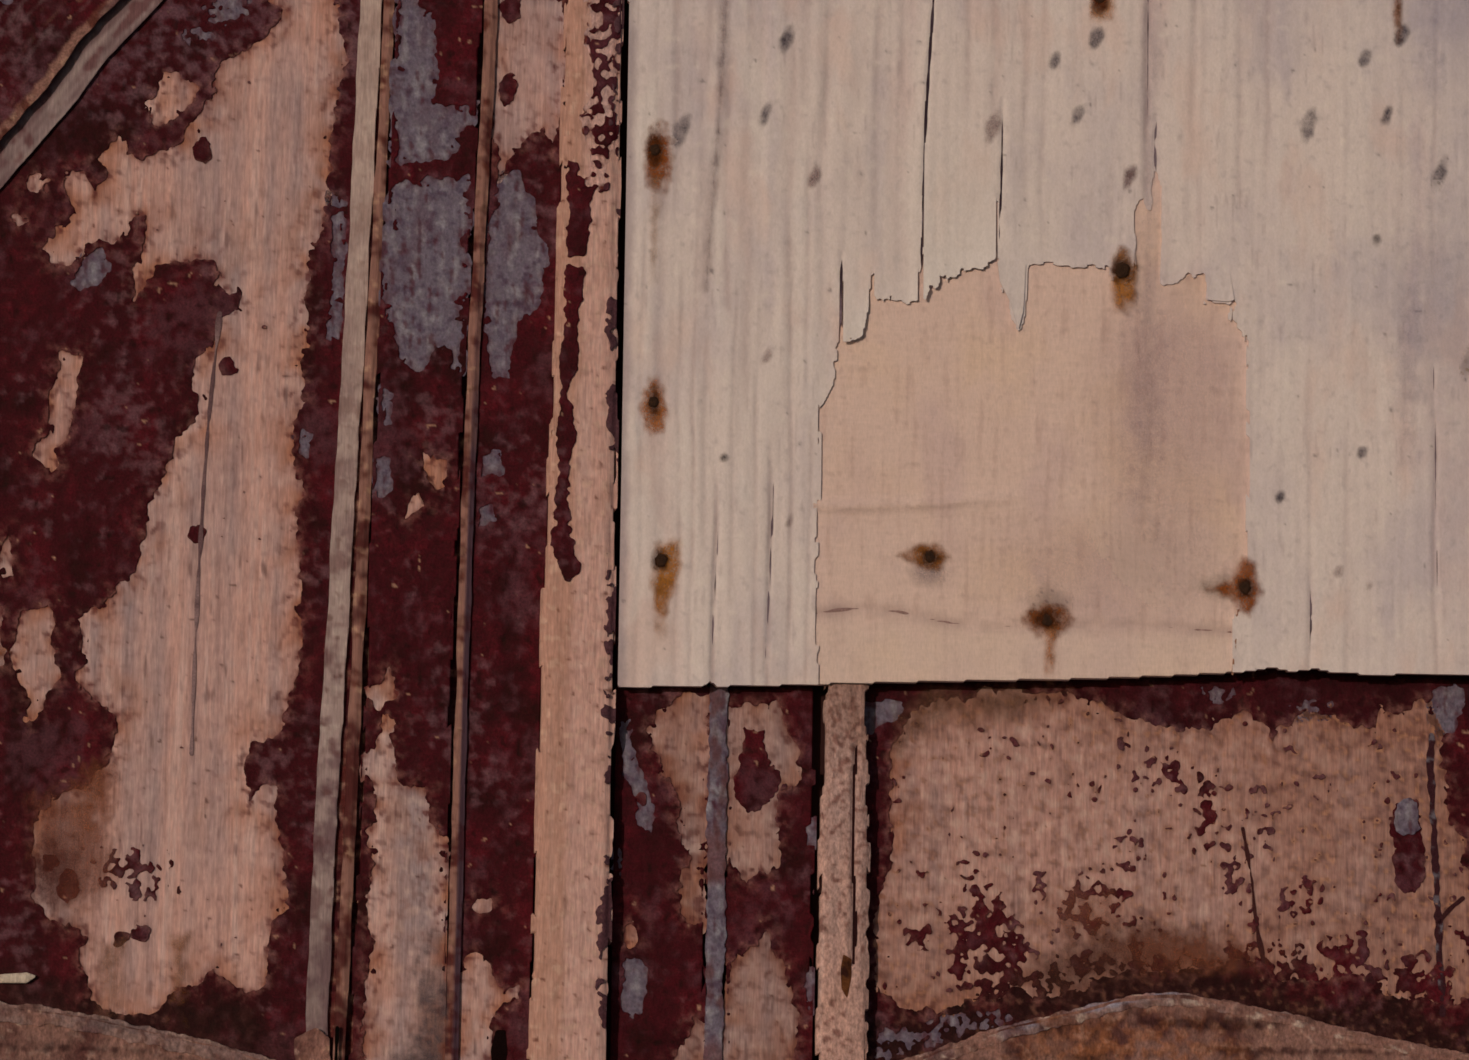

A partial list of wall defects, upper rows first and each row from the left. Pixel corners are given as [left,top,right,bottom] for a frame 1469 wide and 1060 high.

peeling [0,0,349,1015]
peeling [357,667,520,1060]
peeling [376,0,624,582]
corrosion [642,381,666,432]
corrosion [646,134,671,187]
corrosion [654,543,679,614]
peeling [601,553,802,934]
peeling [674,932,815,1060]
crack [920,0,934,267]
corrosion [1025,591,1069,664]
peeling [864,684,1469,1060]
corrosion [1216,559,1261,612]